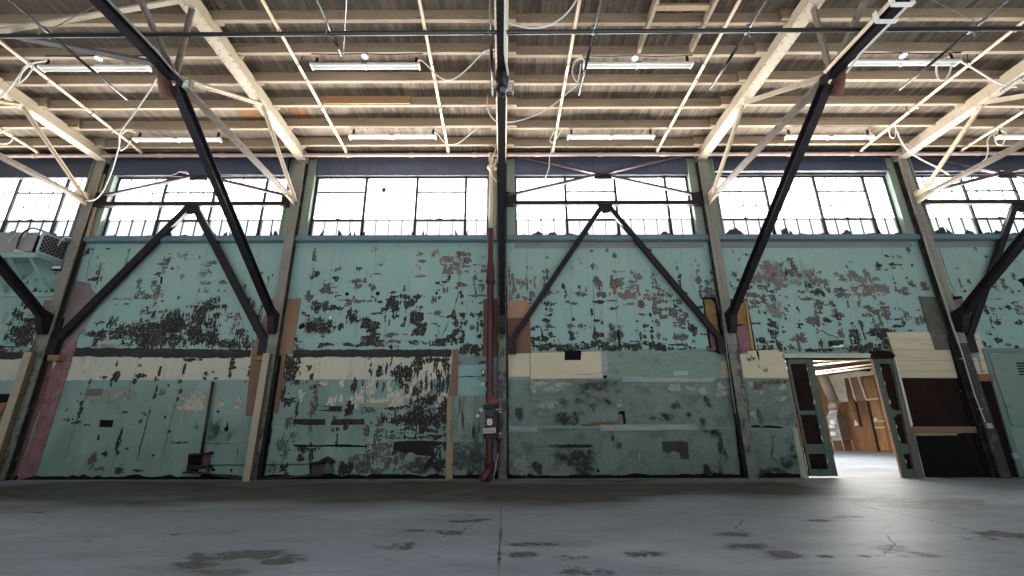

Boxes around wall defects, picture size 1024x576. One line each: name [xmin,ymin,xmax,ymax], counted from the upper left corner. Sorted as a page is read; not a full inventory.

peeling [2,302,36,347]
peeling [59,247,263,444]
peeling [267,247,487,477]
peeling [508,248,722,352]
peeling [729,247,930,353]
peeling [982,261,1024,348]
peeling [87,427,144,477]
water stain [175,550,294,574]